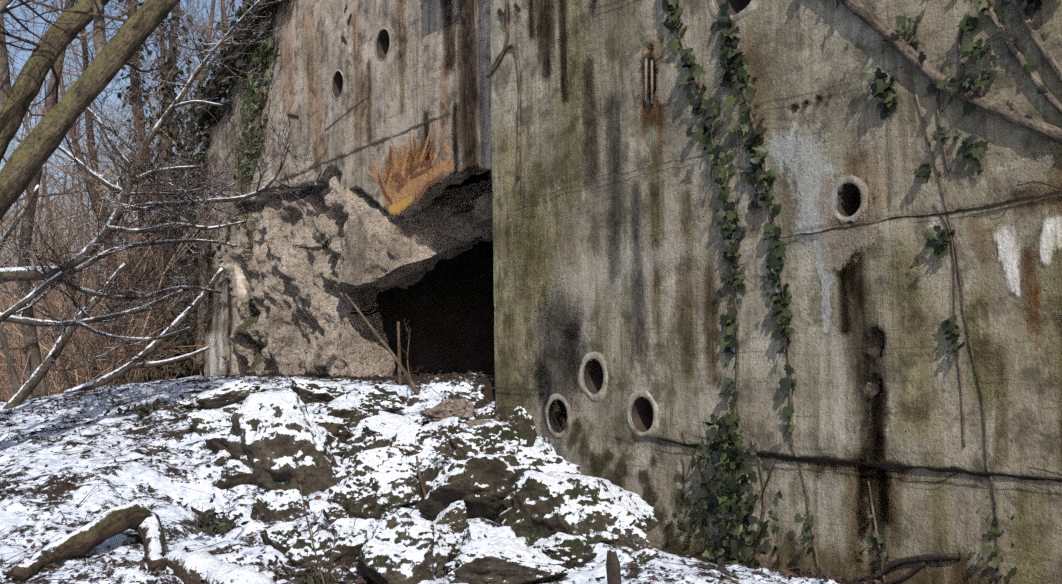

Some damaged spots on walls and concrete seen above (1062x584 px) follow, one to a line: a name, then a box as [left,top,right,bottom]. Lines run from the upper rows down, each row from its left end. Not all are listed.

spalling [208,171,493,378]
damp [769,121,889,549]